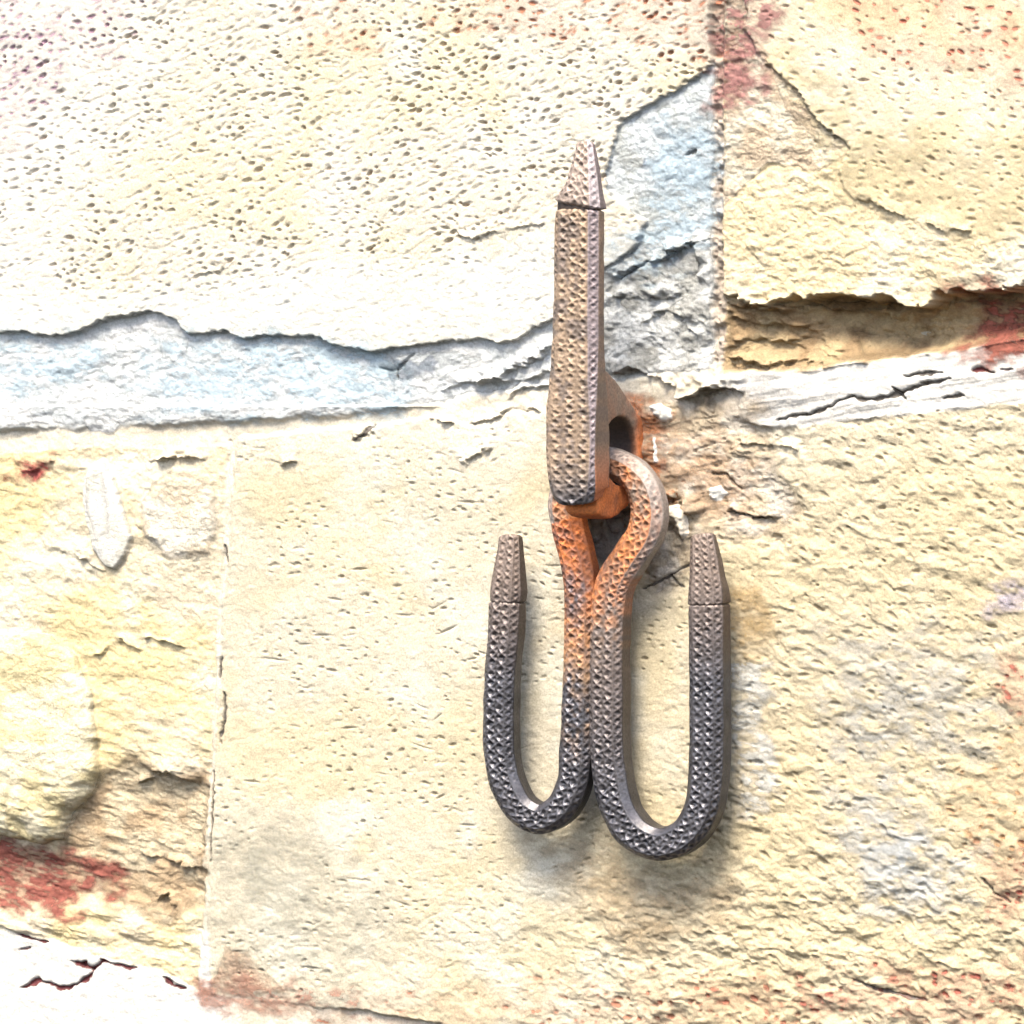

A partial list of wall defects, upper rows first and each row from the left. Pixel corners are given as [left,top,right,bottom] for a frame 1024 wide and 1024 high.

spalling [604,0,850,375]
spalling [0,311,553,432]
spalling [726,297,1024,369]
crack [779,367,1013,420]
corrosion [626,394,661,477]